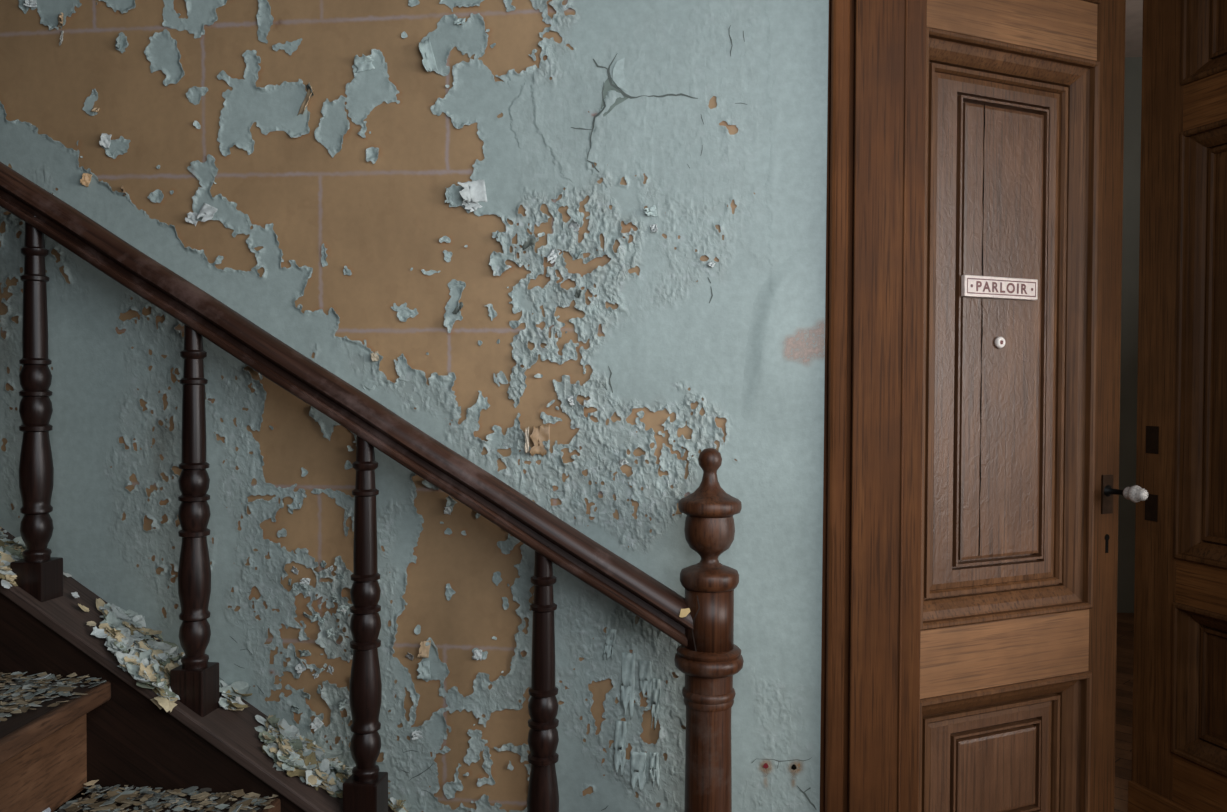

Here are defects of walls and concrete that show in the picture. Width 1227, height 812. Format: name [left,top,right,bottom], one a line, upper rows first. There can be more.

peeling [0,0,727,537]
crack [571,54,704,172]
peeling [719,121,738,135]
peeling [214,366,356,750]
peeling [388,475,534,812]
peeling [580,627,678,798]